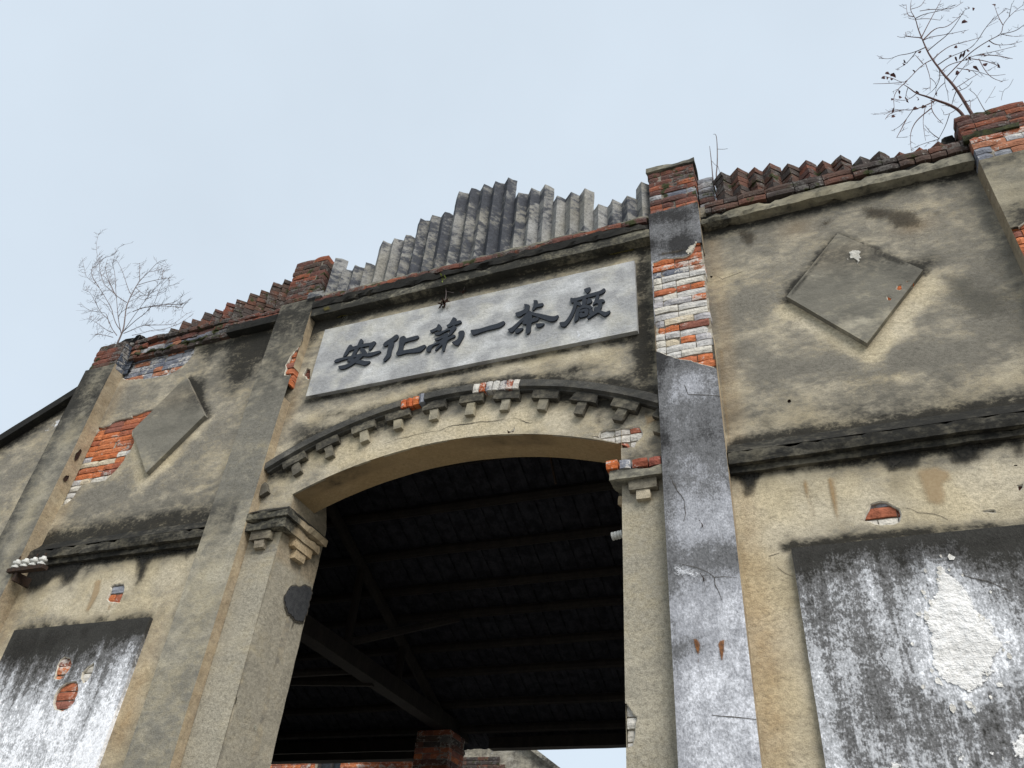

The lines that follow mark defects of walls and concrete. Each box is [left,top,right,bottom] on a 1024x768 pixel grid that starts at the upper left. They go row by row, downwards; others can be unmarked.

damp [866,207,922,227]
spalling [652,241,717,369]
spalling [123,349,194,380]
spalling [284,347,311,389]
spalling [401,393,426,411]
spalling [63,409,153,505]
spalling [592,427,643,448]
damp [741,473,759,495]
damp [883,443,982,502]
spalling [863,501,902,525]
peeling [916,554,1012,714]
spalling [53,657,94,712]